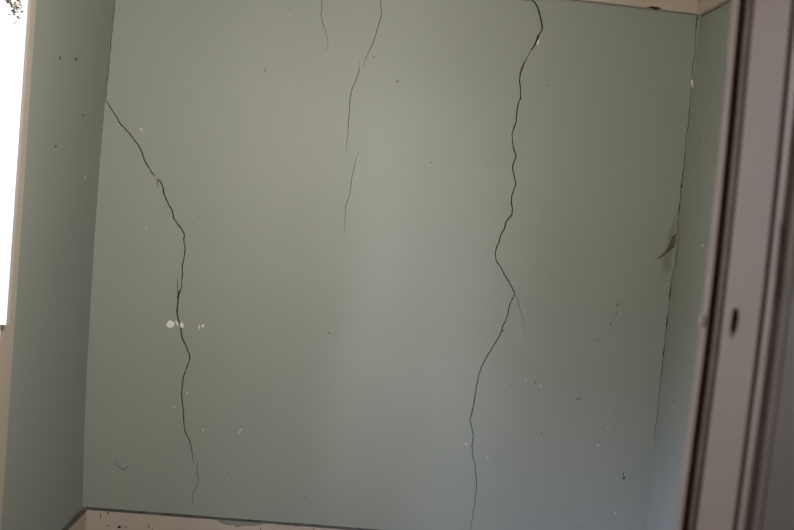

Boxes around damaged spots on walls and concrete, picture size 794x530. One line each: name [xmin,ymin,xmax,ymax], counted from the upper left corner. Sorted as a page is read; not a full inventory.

crack [106,0,199,495]
crack [344,1,382,228]
crack [470,0,543,530]